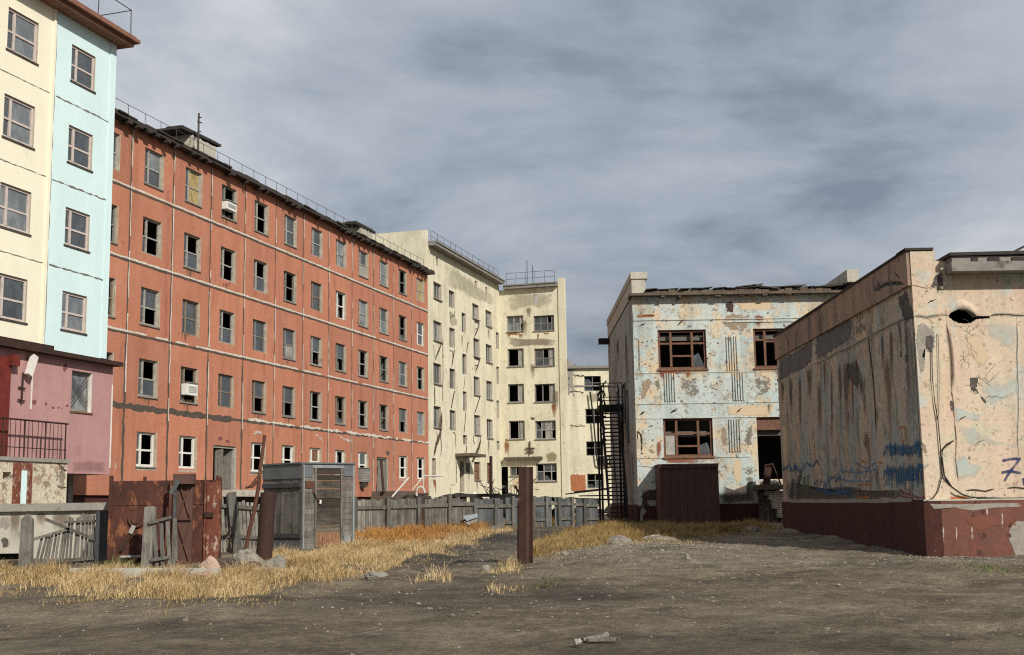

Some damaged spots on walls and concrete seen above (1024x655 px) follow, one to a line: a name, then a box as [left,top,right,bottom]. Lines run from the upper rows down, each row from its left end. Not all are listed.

leakage [452,270,487,301]
peeling [724,298,776,335]
leakage [881,324,916,366]
peeling [639,341,662,401]
peeling [678,313,866,485]
leakage [781,371,811,407]
leakage [831,363,865,414]
crack [815,281,1024,493]
peeling [0,467,53,504]
peeling [570,474,586,491]
peeling [931,495,1024,510]
peeling [1007,521,1024,555]